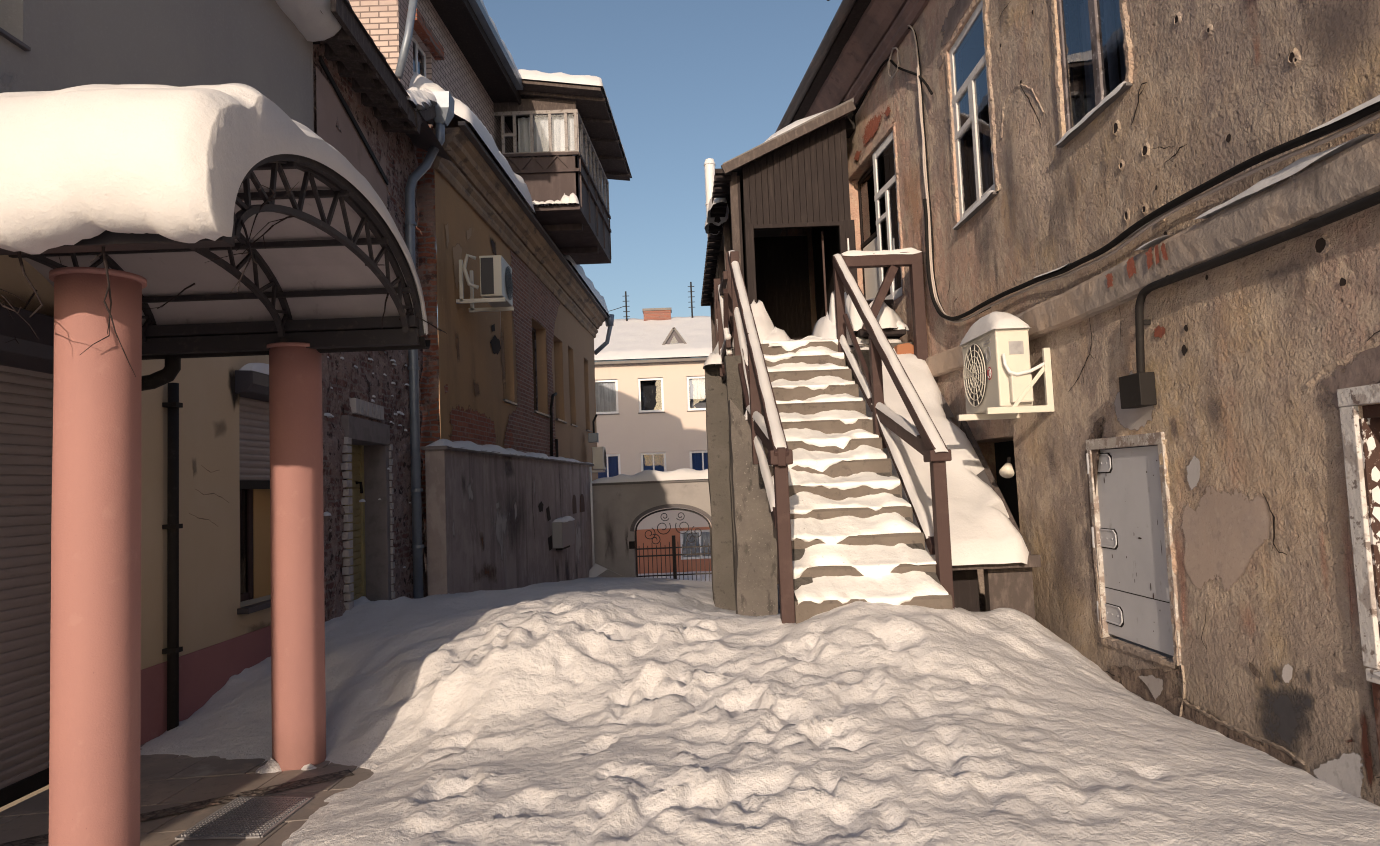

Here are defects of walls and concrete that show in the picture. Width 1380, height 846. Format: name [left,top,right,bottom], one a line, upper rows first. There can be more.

spalling [444,249,560,457]
spalling [1305,340,1380,409]
peeling [1367,436,1380,552]
water stain [1258,663,1314,752]